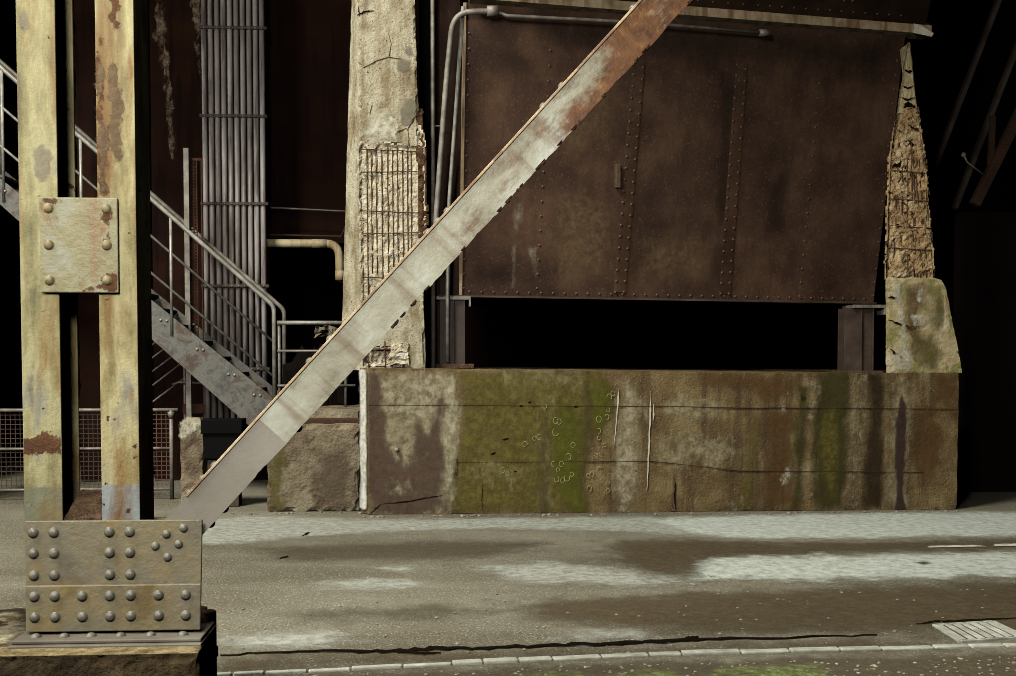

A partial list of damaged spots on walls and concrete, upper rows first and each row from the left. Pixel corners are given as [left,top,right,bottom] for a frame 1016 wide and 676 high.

corrosion [96,37,110,196]
corrosion [108,0,121,30]
spalling [356,98,429,303]
peeling [397,46,413,72]
spalling [883,102,935,280]
corrosion [23,431,61,456]
water stain [852,283,925,510]
crack [220,634,877,657]